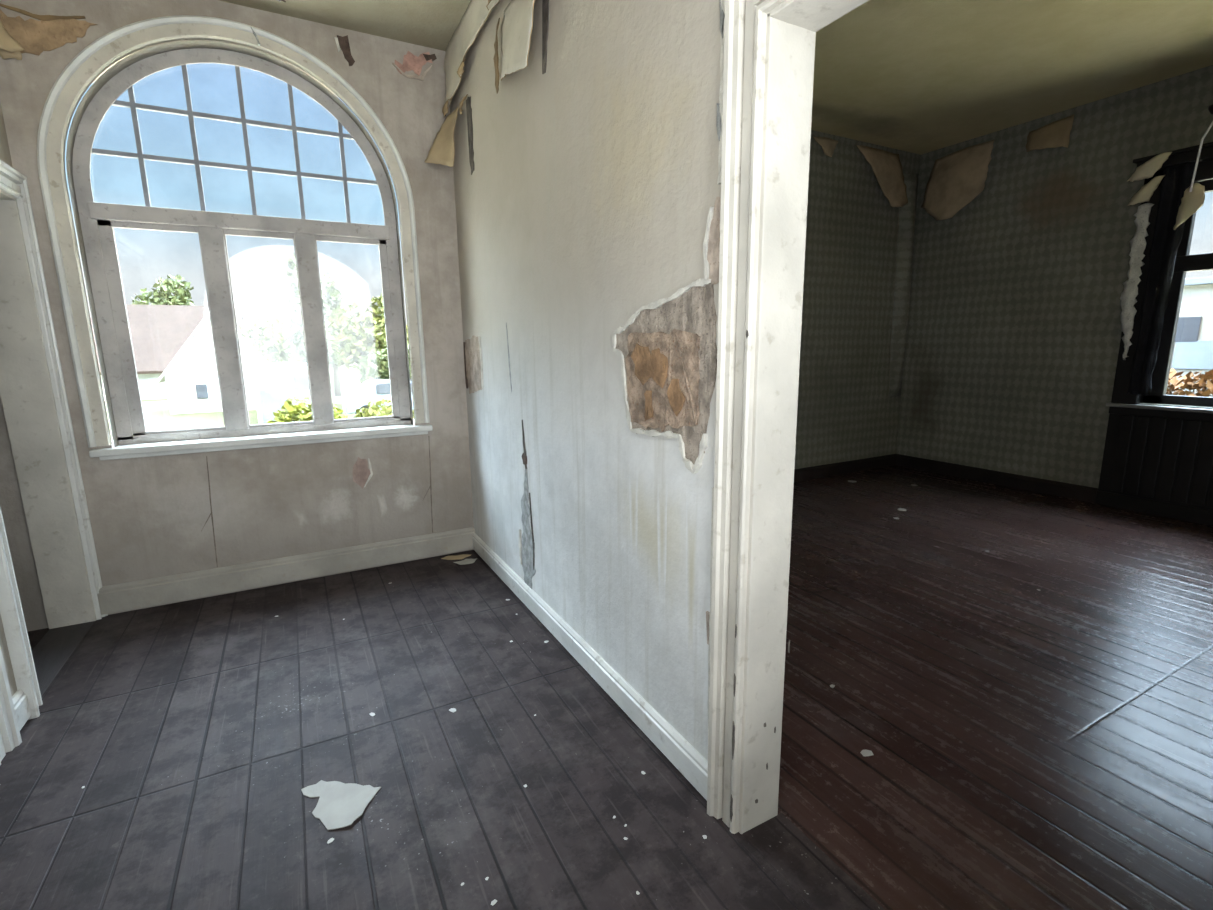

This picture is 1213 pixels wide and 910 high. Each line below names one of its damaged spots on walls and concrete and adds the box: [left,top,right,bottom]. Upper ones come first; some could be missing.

spalling [0,3,97,60]
peeling [486,0,500,93]
spalling [612,0,725,474]